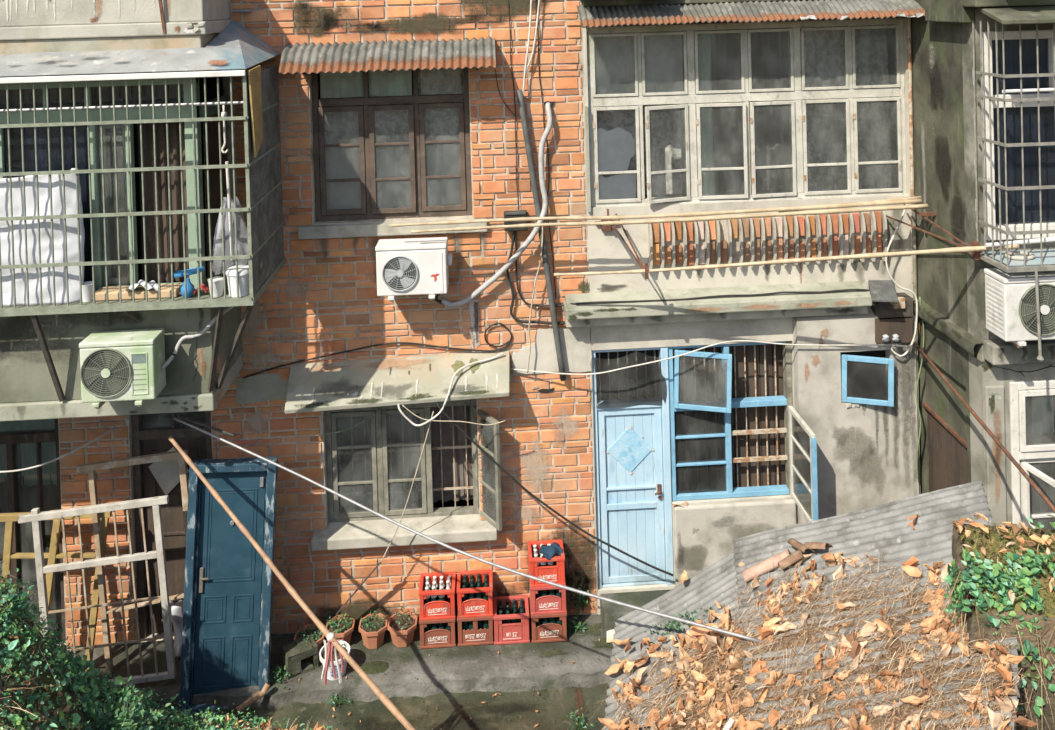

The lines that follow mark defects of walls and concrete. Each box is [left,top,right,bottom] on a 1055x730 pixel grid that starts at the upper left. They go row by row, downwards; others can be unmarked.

damp [293,0,546,36]
damp [929,46,943,110]
damp [921,125,965,243]
damp [312,367,418,403]